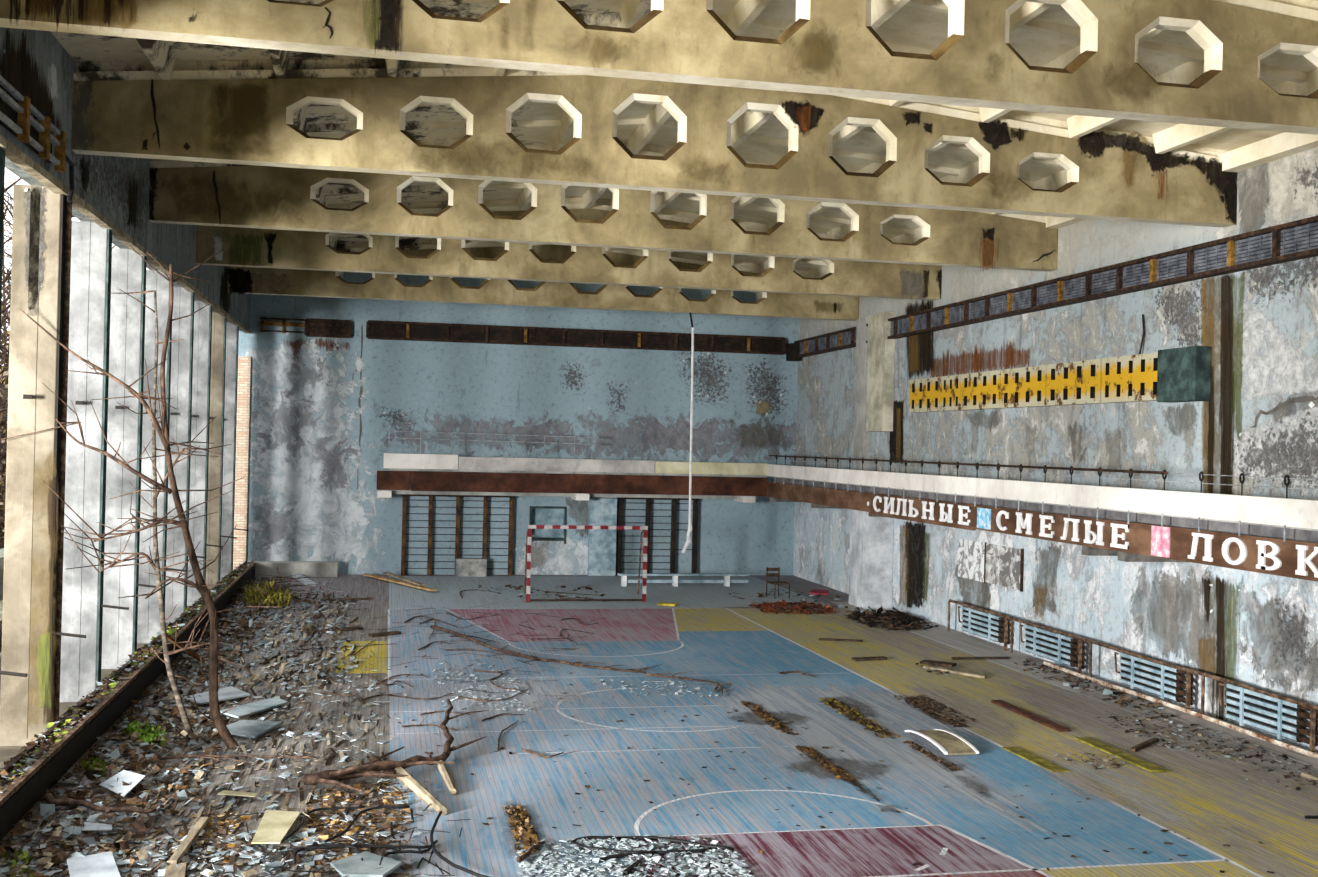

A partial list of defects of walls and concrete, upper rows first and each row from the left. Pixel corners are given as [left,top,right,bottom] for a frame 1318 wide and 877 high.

water stain [0,0,137,144]
crack [150,79,160,149]
water stain [363,0,403,52]
water stain [72,152,218,250]
peeling [245,330,420,574]
crack [1250,395,1318,428]